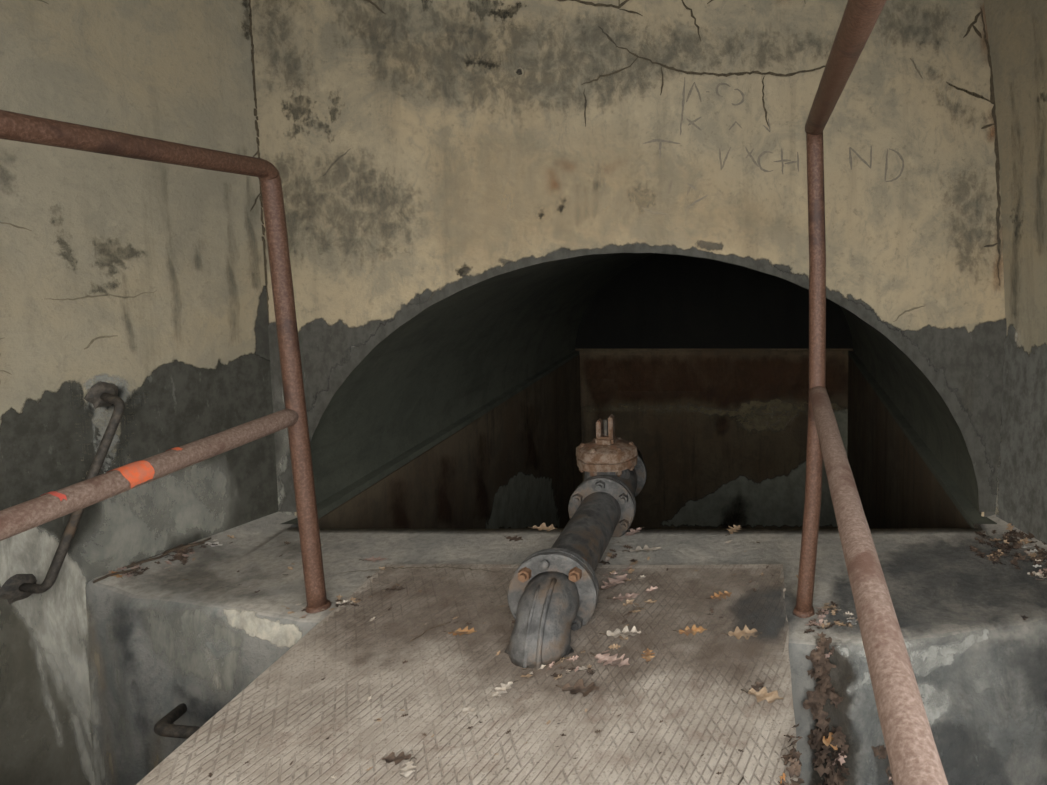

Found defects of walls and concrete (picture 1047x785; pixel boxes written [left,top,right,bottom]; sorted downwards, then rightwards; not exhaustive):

water stain [469,0,526,21]
crack [557,0,825,127]
water stain [282,96,340,135]
water stain [58,238,77,269]
water stain [93,241,144,293]
flaking render [306,240,809,442]
corrosion [583,357,809,432]
corrosion [825,360,846,395]
flaking render [826,287,997,512]
flaking render [75,465,229,578]
flaking render [485,471,560,529]
flaking render [662,461,806,528]